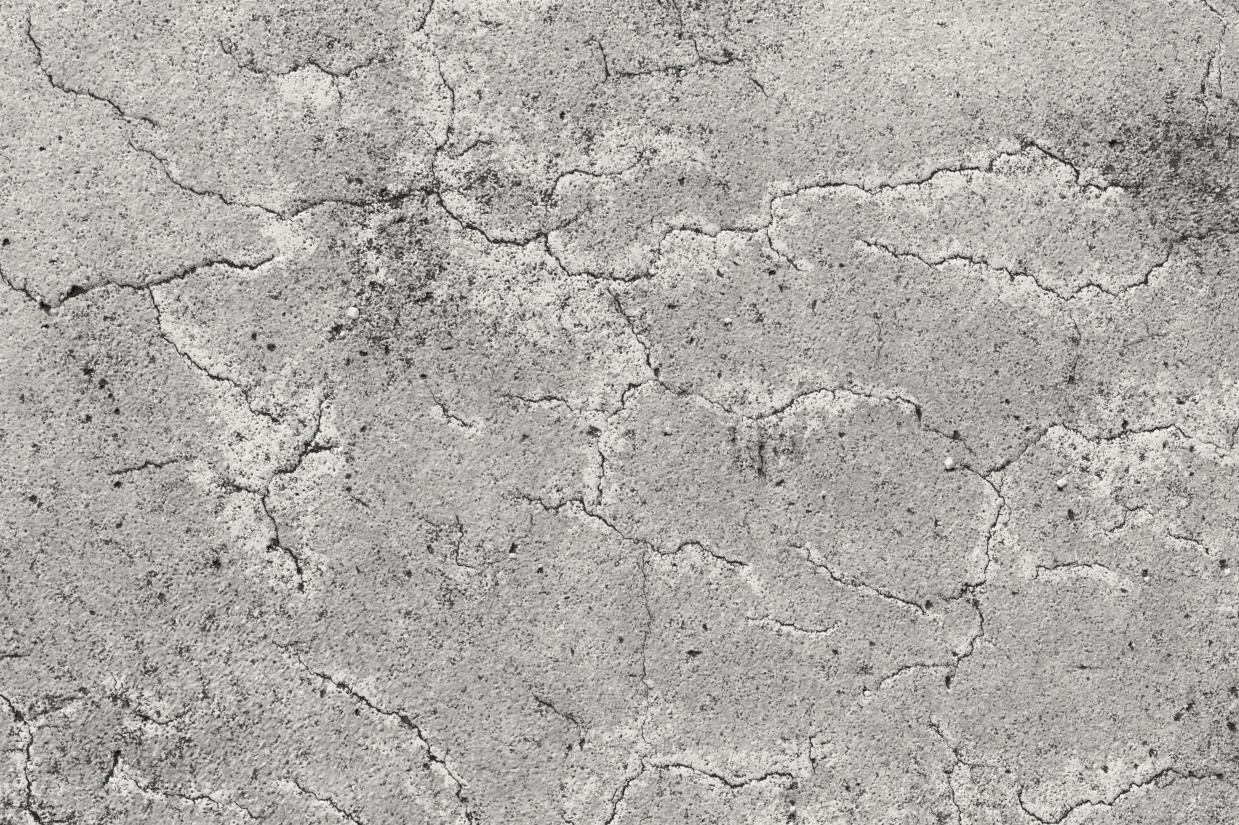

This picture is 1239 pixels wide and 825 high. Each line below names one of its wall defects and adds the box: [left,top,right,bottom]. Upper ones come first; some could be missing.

crack [26,14,160,129]
crack [0,254,282,425]
crack [108,0,1239,691]
crack [0,651,31,660]
crack [0,672,266,825]
crack [271,639,473,825]
crack [511,440,819,825]
crack [929,713,1220,825]